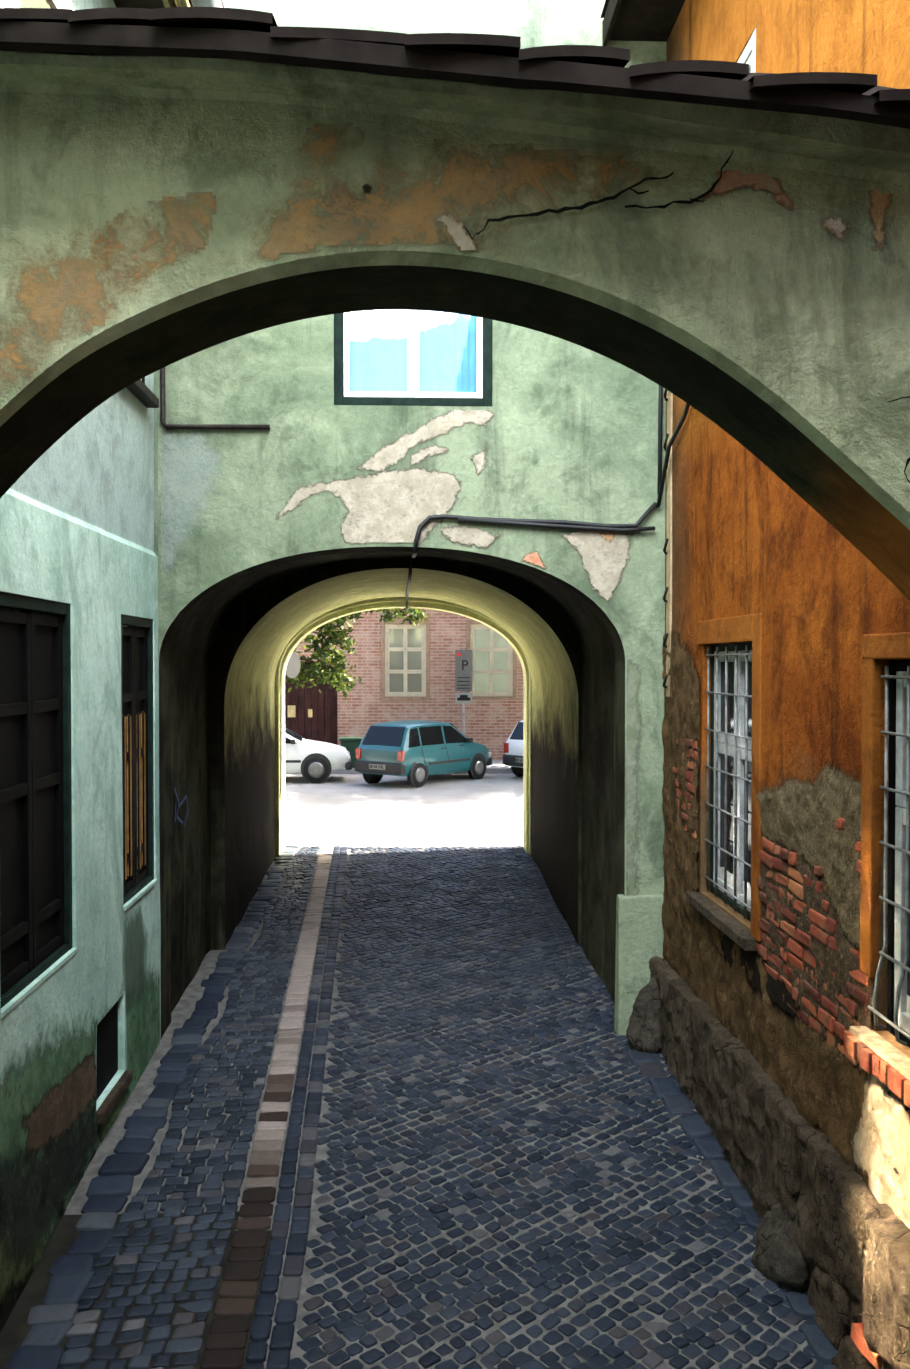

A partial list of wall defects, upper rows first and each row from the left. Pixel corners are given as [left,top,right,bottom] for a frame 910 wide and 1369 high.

peeling [0,192,216,383]
peeling [258,123,649,260]
crack [463,150,734,240]
flaking render [821,215,850,241]
peeling [276,410,499,548]
flaking render [522,551,547,569]
peeling [561,530,632,601]
flaking render [661,630,910,1186]
damp [0,1095,100,1333]